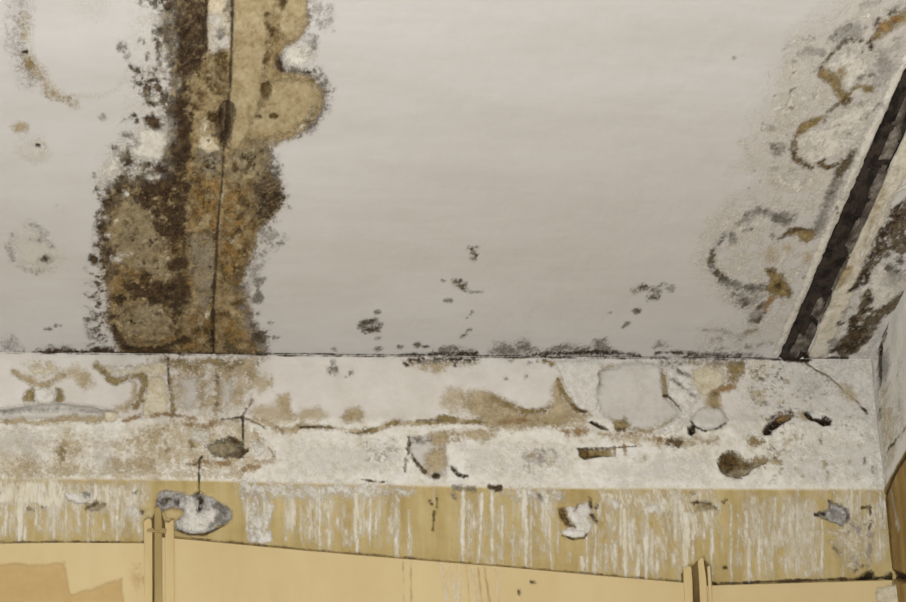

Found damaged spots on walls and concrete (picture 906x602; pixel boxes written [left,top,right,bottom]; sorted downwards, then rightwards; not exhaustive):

crack [33,0,780,417]
leakage [655,23,873,384]
leakage [0,0,415,558]
leakage [342,379,591,441]
peeling [554,359,725,435]
spalling [717,451,781,478]
spalling [747,409,831,447]
leakage [819,199,906,559]
spalling [156,490,231,536]
leakage [452,484,563,573]
spalling [559,501,598,540]
leakage [569,488,824,584]